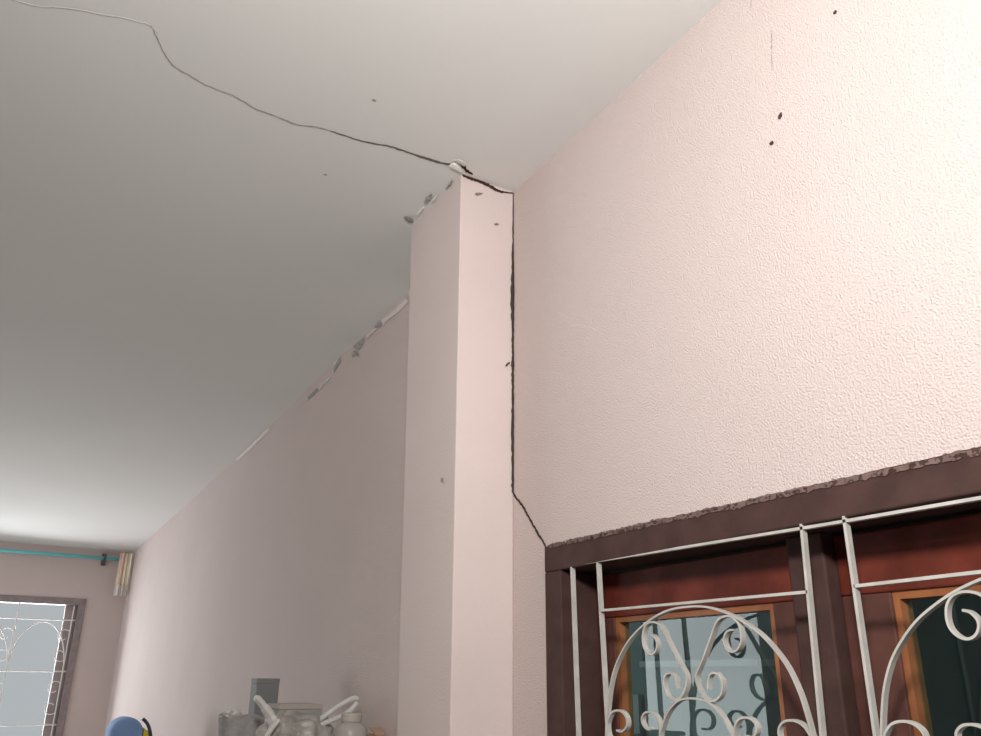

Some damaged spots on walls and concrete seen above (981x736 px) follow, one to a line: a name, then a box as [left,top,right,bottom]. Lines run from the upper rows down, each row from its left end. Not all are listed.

crack [14,0,547,547]
peeling [293,299,408,410]